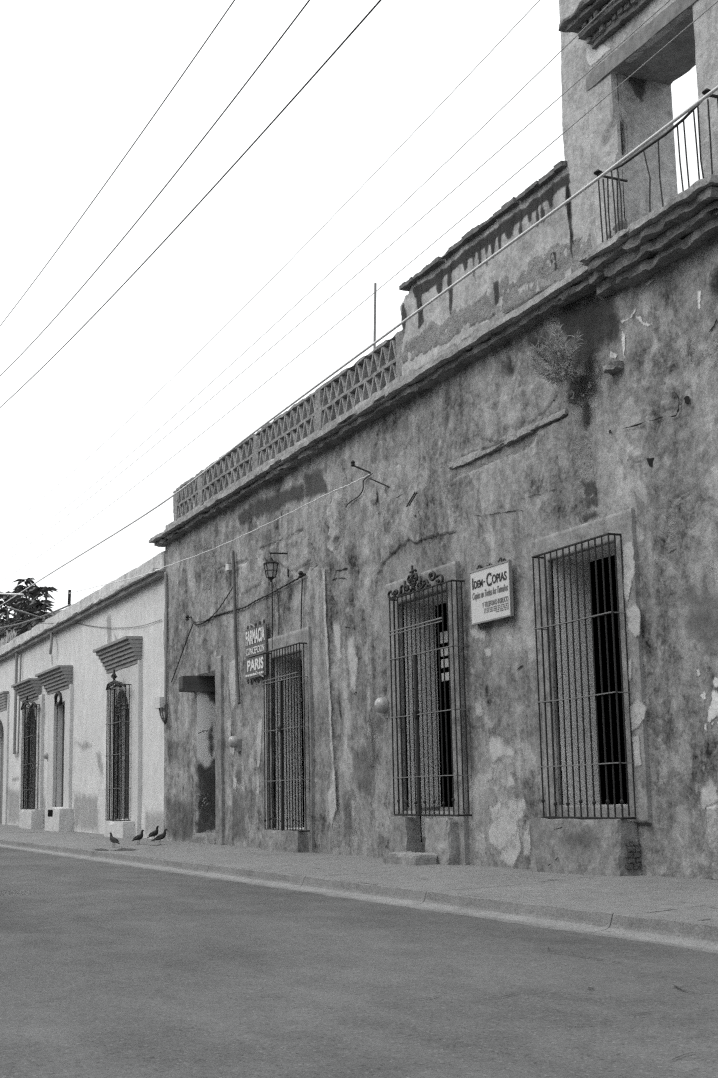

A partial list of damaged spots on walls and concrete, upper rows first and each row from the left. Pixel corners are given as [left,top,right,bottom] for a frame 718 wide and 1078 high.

flaking render [701,677,718,730]
flaking render [696,767,718,809]